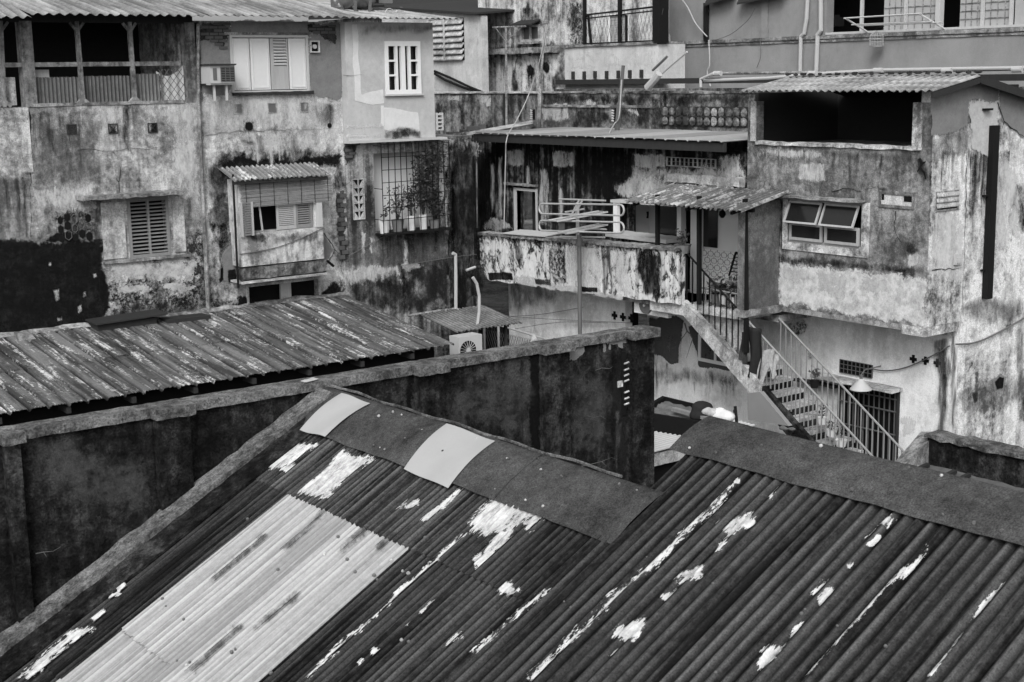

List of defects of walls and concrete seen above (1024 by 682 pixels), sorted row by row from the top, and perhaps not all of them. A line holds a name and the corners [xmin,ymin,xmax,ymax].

water stain [511,70,526,119]
water stain [541,66,743,129]
water stain [0,107,256,332]
water stain [322,137,660,318]
water stain [943,130,1024,249]
water stain [966,300,1021,318]
peeling [269,442,318,473]
peeling [298,450,376,499]
peeling [307,499,551,678]
peeling [527,478,740,681]
peeling [756,621,803,671]
peeling [806,554,925,675]